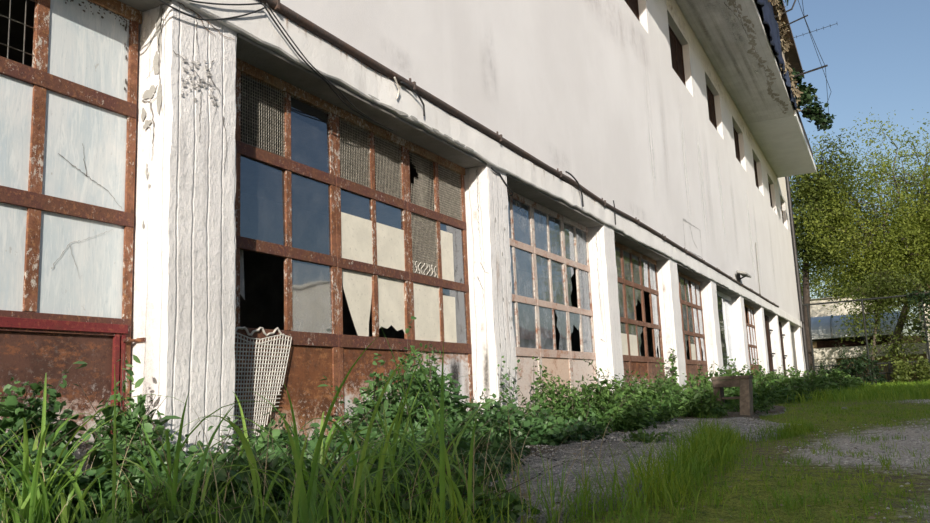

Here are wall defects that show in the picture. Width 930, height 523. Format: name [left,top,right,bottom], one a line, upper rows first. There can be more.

crack [142,2,235,172]
crack [58,143,122,208]